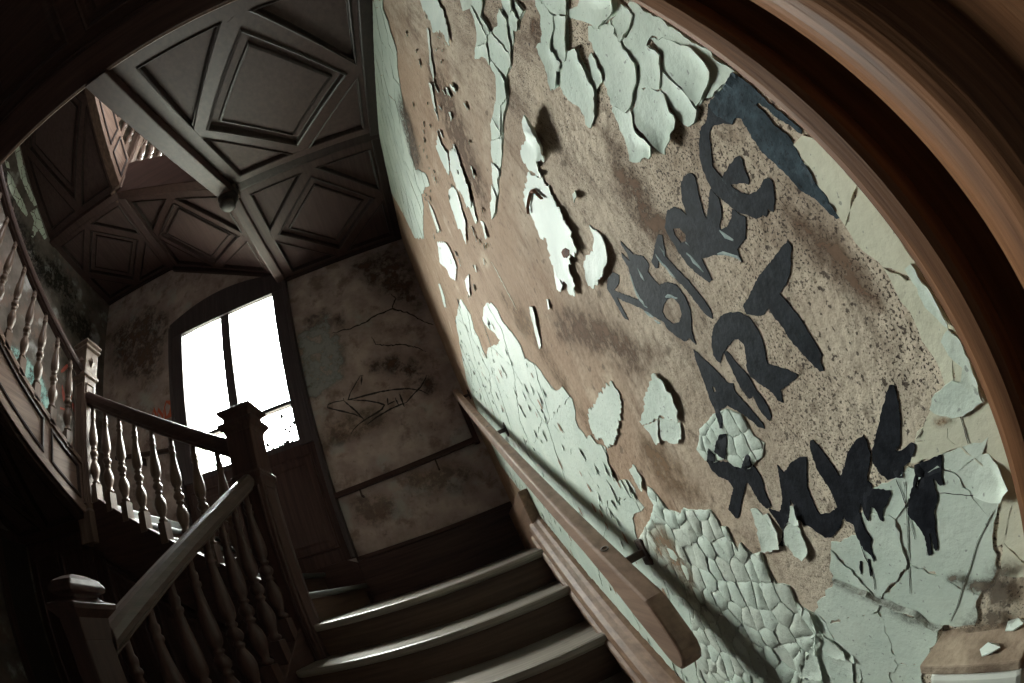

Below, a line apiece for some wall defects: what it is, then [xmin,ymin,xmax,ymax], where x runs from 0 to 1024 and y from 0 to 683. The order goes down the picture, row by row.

crack [333,294,433,352]
peeling [372,0,1024,683]
crack [896,480,915,586]